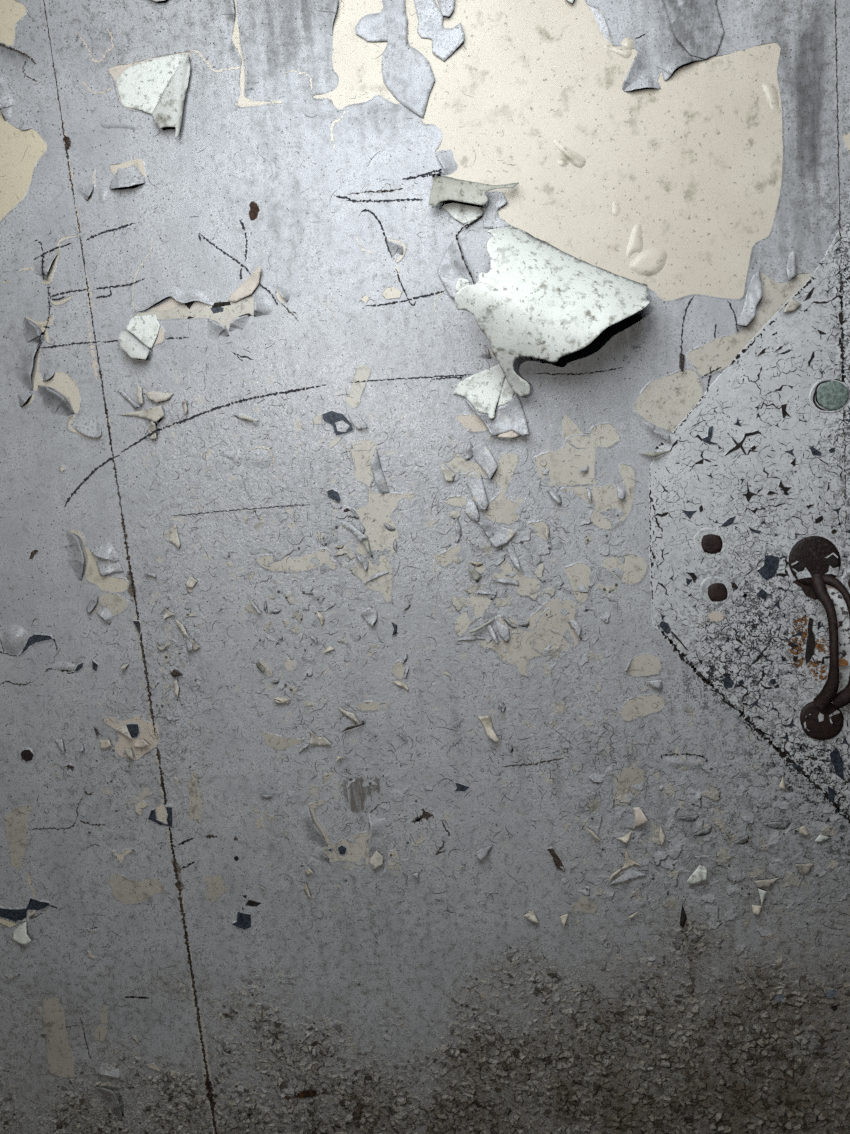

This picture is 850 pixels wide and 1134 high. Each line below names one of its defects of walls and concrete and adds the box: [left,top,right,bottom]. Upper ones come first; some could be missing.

peeling [0,0,48,222]
peeling [107,49,193,115]
peeling [311,0,401,111]
peeling [386,238,407,263]
peeling [133,266,291,347]
peeling [15,295,104,441]
peeling [405,0,815,730]
peeling [63,529,142,635]
peeling [212,365,434,732]
rust [788,615,849,682]
peeling [0,714,850,1134]
rust [284,1089,317,1100]